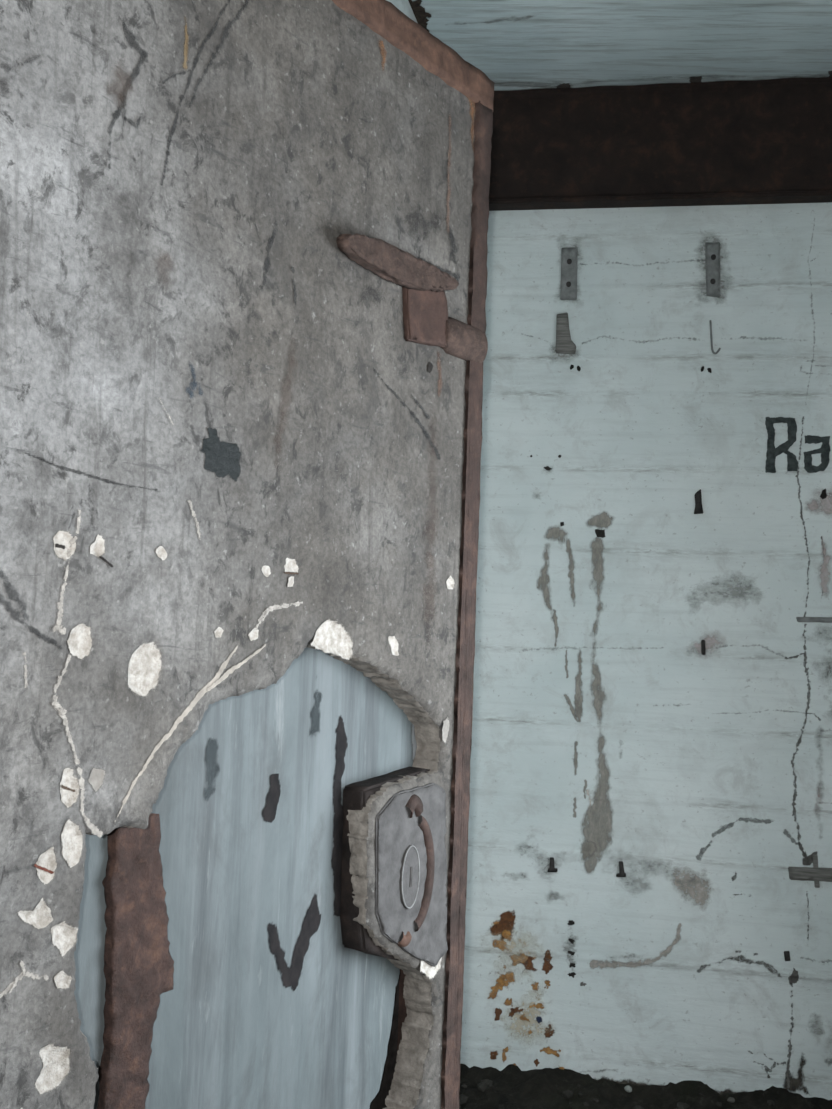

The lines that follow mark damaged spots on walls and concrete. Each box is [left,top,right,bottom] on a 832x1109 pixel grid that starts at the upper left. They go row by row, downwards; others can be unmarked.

crack [52,509,103,837]
spalling [128,642,162,697]
crack [254,601,303,630]
damp [537,512,613,722]
crack [772,417,821,866]
spalling [305,619,450,1109]
damp [573,735,612,873]
crack [0,961,49,998]
corrosion [97,813,174,1109]
corrosion [488,910,565,1070]
crack [785,968,799,1089]